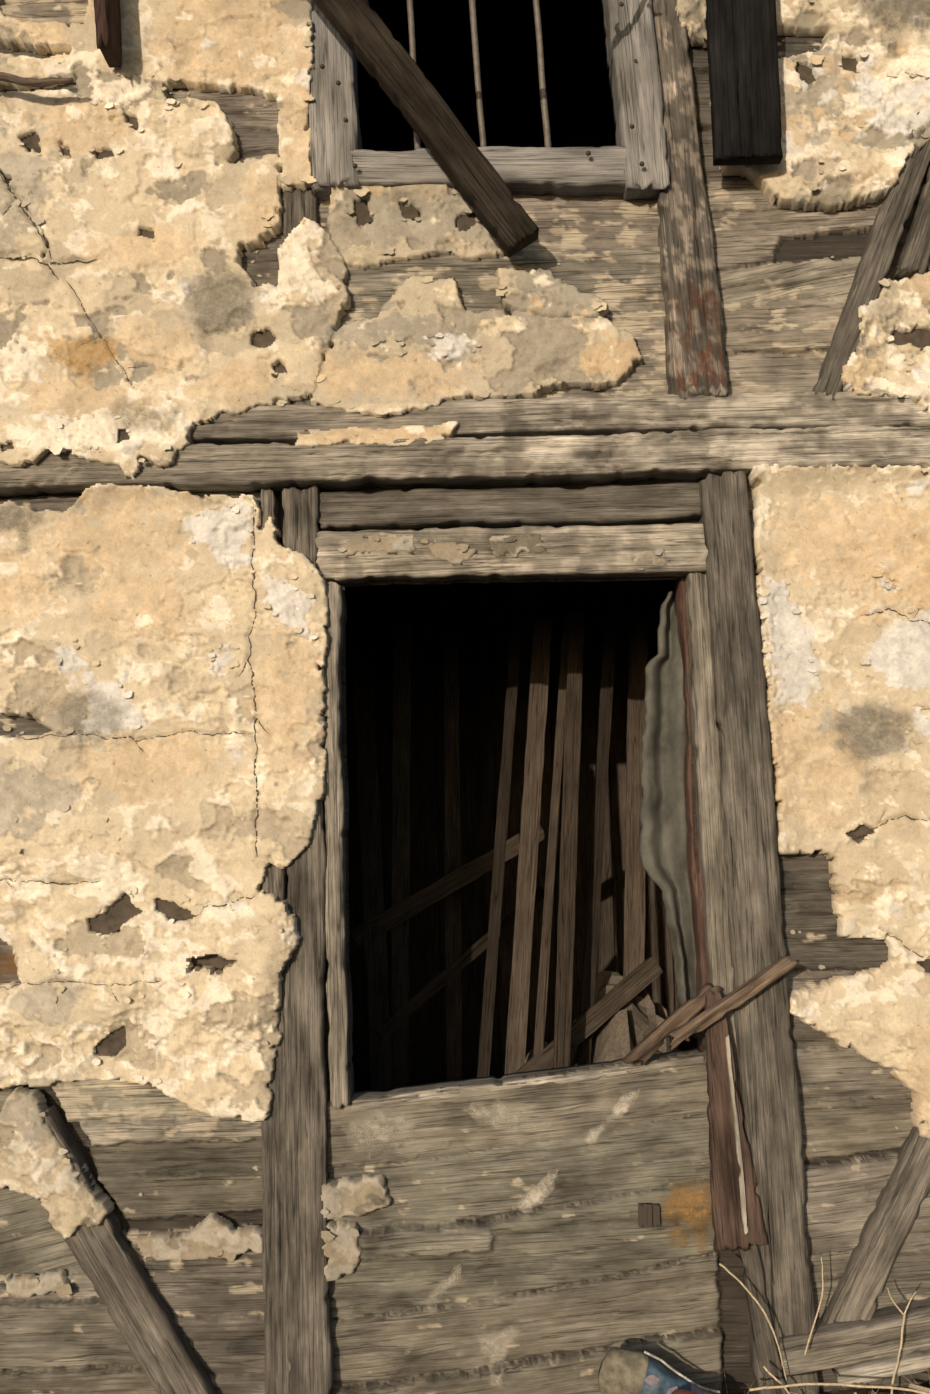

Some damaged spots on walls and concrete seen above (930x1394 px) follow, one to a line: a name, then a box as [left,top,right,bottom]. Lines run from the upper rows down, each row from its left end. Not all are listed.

flaking render [675,0,707,48]
crack [0,175,144,390]
flaking render [703,0,930,419]
crack [20,510,268,857]
flaking render [0,0,661,1262]
flaking render [632,549,670,576]
crack [205,895,256,913]
flaking render [746,463,930,1318]
flaking render [4,1269,73,1298]